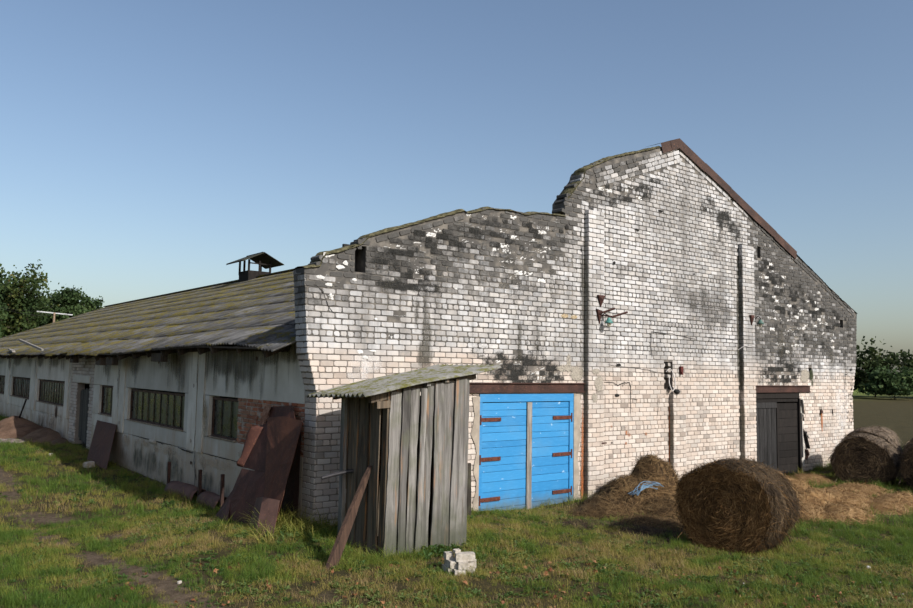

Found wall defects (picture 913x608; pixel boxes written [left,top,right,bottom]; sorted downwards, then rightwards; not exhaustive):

spalling [316,252,348,300]
spalling [409,228,447,280]
spalling [480,209,569,288]
water stain [476,251,603,437]
water stain [700,195,741,242]
spalling [759,262,848,354]
water stain [195,345,296,436]